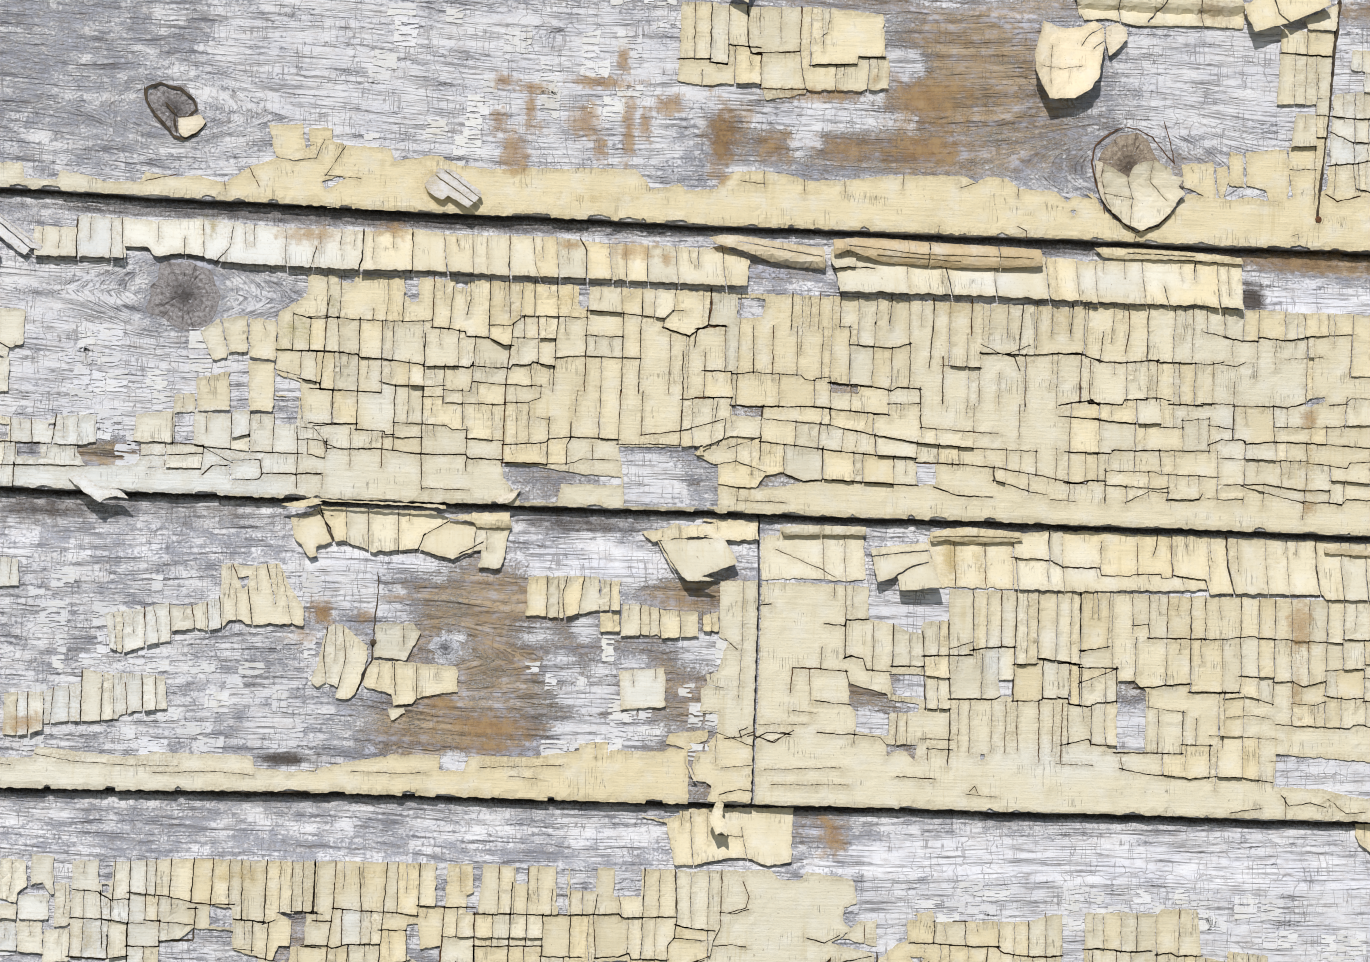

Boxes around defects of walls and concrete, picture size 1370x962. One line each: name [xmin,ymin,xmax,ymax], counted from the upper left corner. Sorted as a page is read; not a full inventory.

peeling [580,0,890,125]
peeling [1244,0,1342,41]
crack [1277,1,1370,222]
peeling [0,76,1370,309]
peeling [60,324,171,469]
peeling [188,316,275,412]
peeling [45,440,128,502]
crack [0,273,1370,822]
peeling [0,504,942,962]
peeling [1119,757,1370,852]
crack [66,857,708,962]
crack [888,908,1268,962]